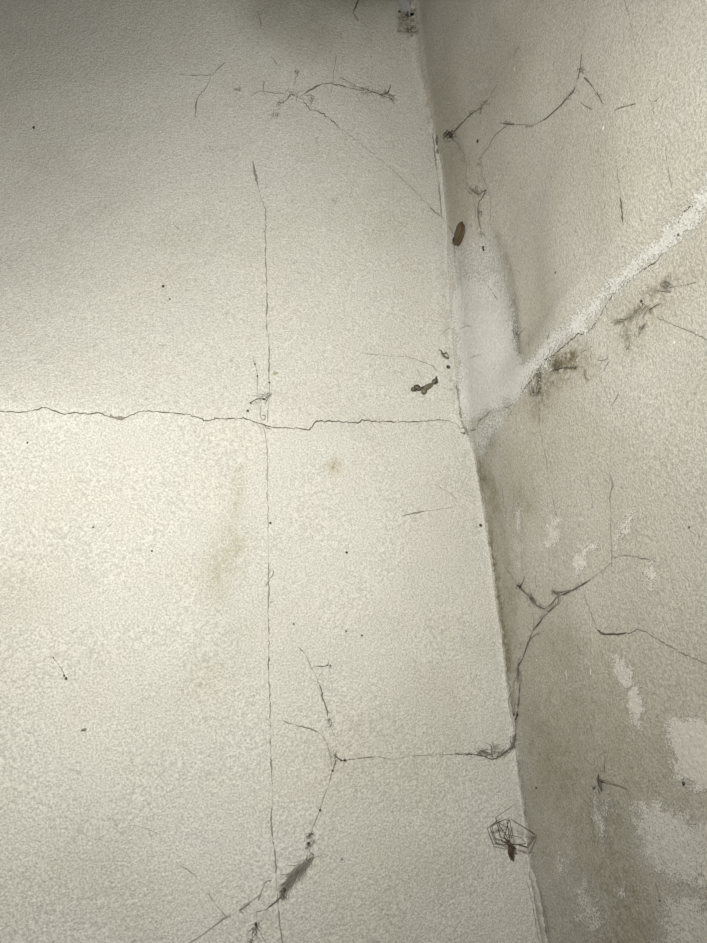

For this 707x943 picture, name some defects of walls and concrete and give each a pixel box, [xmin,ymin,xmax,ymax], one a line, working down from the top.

crack [181,62,225,118]
crack [388,129,456,257]
crack [608,114,624,225]
crack [656,317,706,340]
crack [0,163,668,943]
water stain [538,505,642,582]
crack [576,593,707,664]
water stain [604,648,647,735]
water stain [589,703,707,943]
water stain [547,836,641,941]